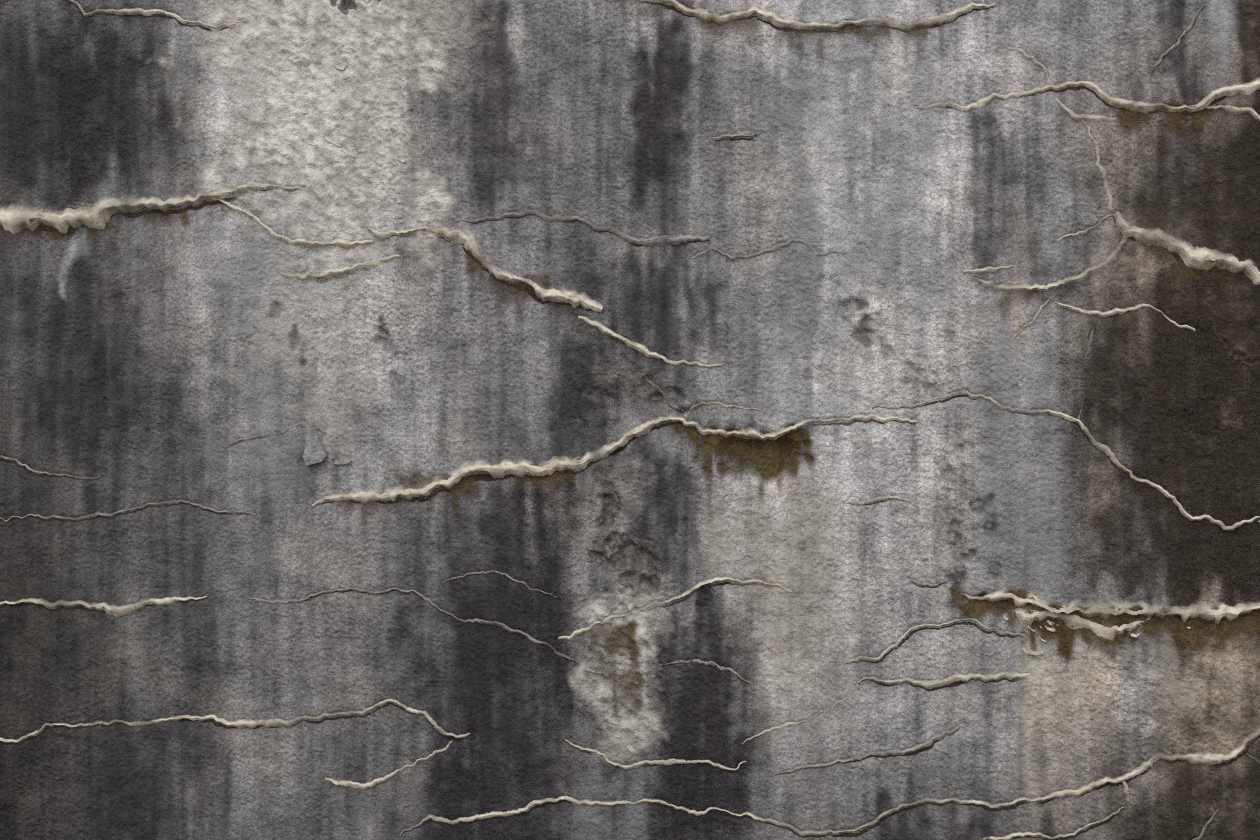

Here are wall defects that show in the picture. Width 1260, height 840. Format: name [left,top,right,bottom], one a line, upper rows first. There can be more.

water stain [631,19,692,197]
crack [916,7,1260,285]
peeling [303,420,352,466]
crack [0,181,1260,531]
water stain [635,460,688,570]
water stain [1136,0,1260,607]
crack [0,699,470,790]
water stain [423,480,566,840]
water stain [633,585,749,840]
crack [400,722,1260,840]
peeling [1003,607,1067,658]
crack [831,579,1260,708]